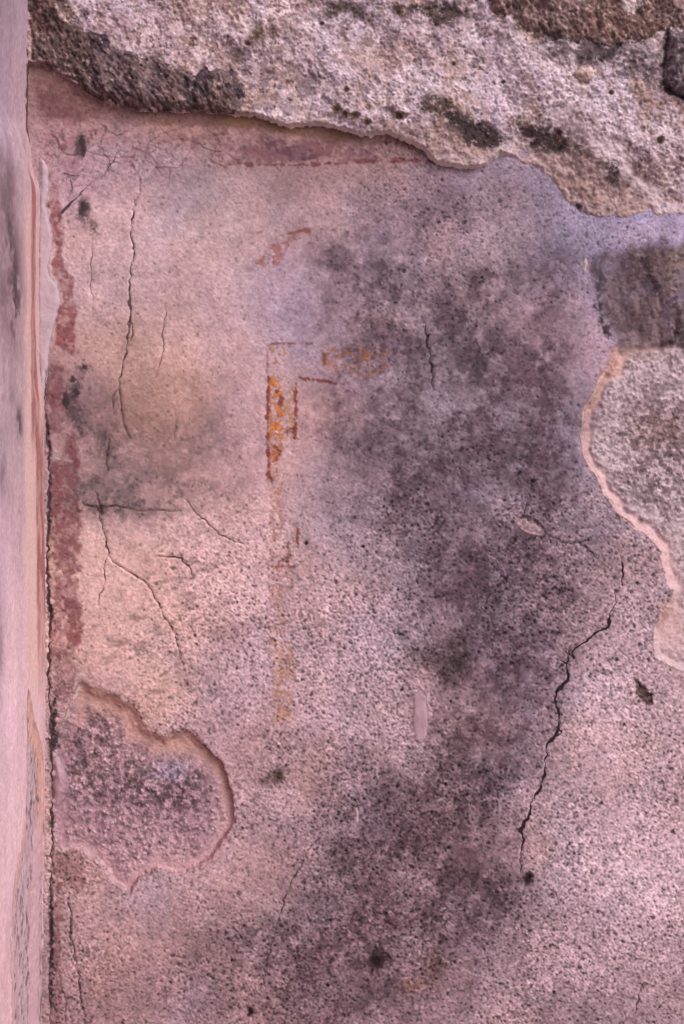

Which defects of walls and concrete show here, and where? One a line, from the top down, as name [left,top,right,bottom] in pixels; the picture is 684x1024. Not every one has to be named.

flaking render [27,0,684,218]
peeling [47,202,76,353]
crack [52,127,244,471]
peeling [51,436,82,658]
spalling [11,676,235,1024]
crack [87,495,241,666]
leakage [248,709,536,1024]
leakage [320,247,579,699]
crack [519,556,634,873]
spalling [580,245,684,671]